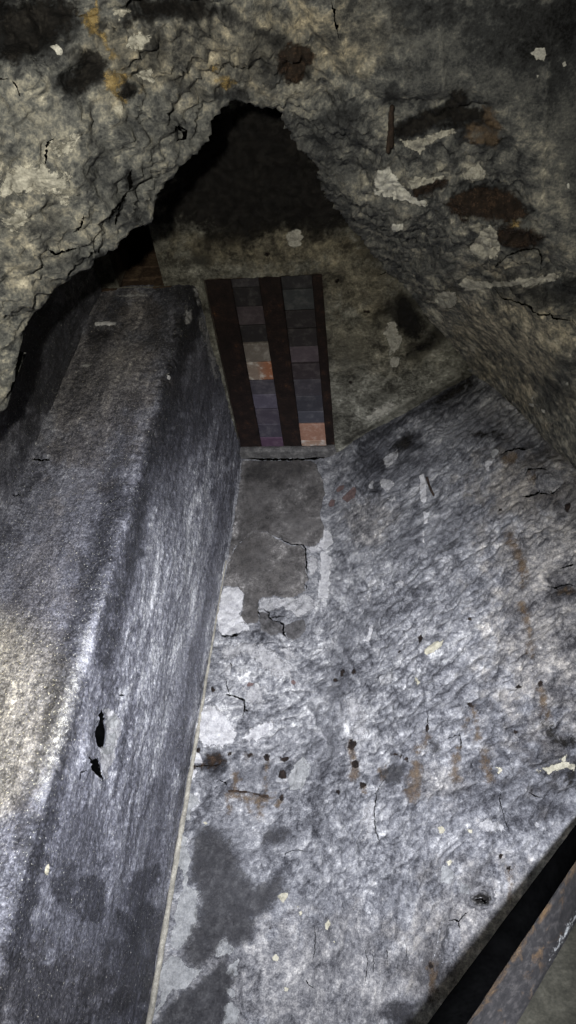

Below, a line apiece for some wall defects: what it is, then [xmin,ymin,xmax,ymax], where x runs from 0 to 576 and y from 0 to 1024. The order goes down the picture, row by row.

corrosion [104,71,127,103]
corrosion [278,42,315,85]
crack [44,139,61,178]
crack [48,216,84,255]
crack [109,170,133,225]
spalling [374,166,444,207]
corrosion [413,179,543,248]
spalling [466,225,500,260]
crack [280,539,309,591]
spalling [217,587,297,680]
spalling [89,708,121,781]
leakage [161,827,281,1024]